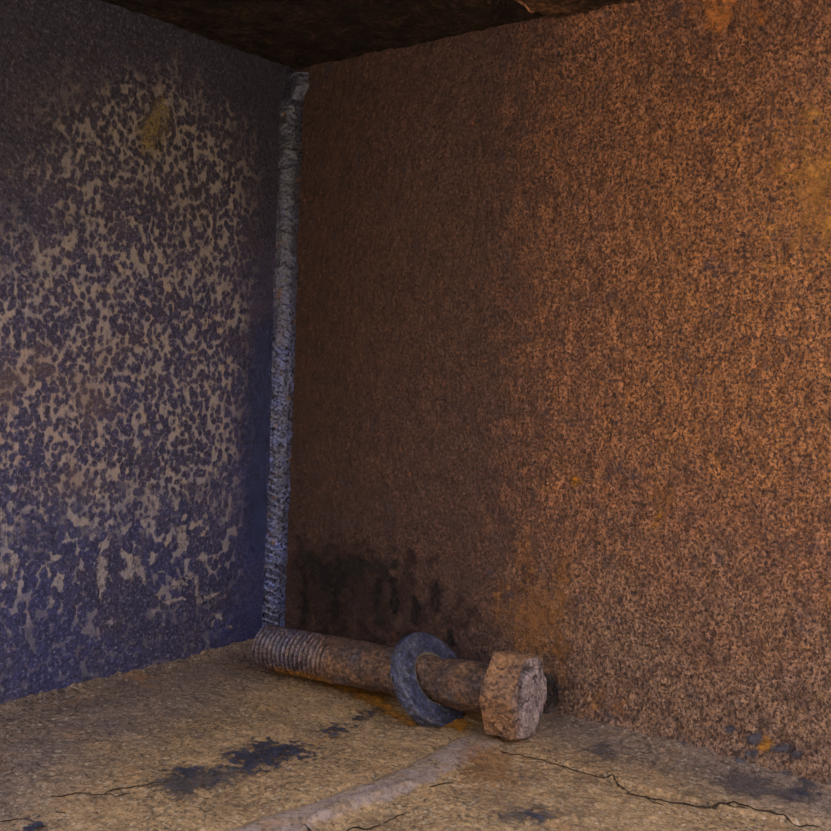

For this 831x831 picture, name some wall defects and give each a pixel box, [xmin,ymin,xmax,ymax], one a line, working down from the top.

leakage [294,537,399,625]
leakage [309,708,384,738]
rust [317,680,418,726]
crack [50,779,168,814]
leakage [137,737,323,802]
crack [500,751,821,828]
leakage [13,816,46,831]